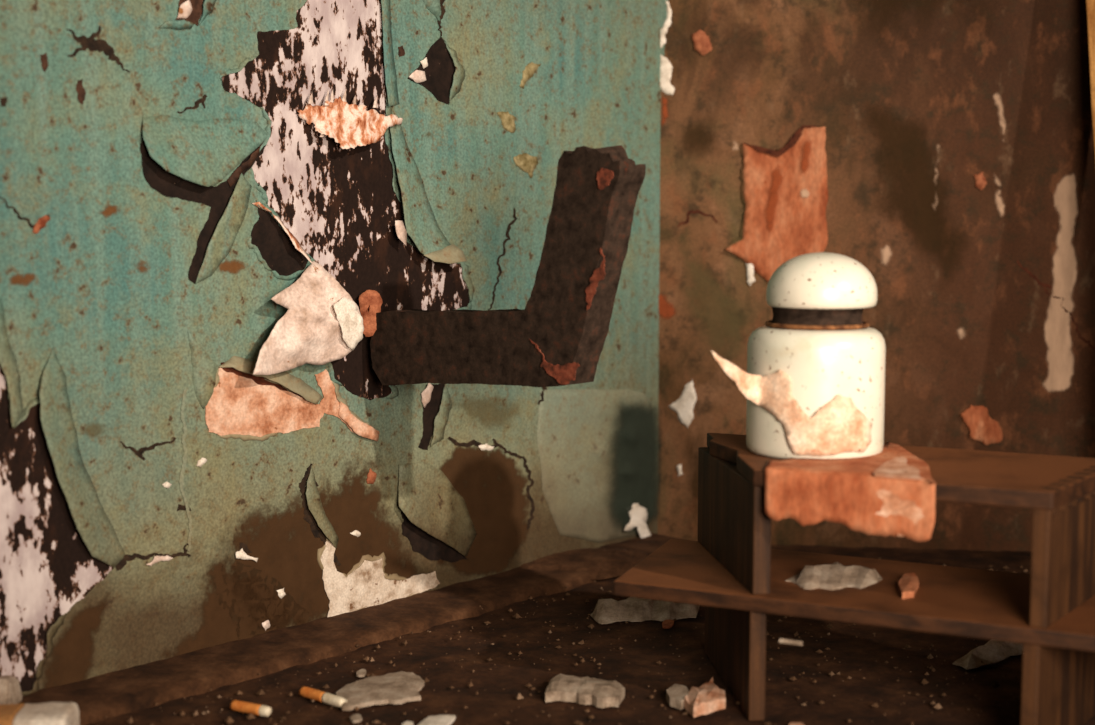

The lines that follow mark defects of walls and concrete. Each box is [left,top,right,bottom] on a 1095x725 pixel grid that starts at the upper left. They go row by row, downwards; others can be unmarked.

crack [66,26,130,73]
corrosion [802,141,811,172]
peeling [33,215,50,234]
peeling [140,0,474,441]
corrosion [766,166,783,230]
crack [488,208,517,310]
corrosion [659,295,675,318]
crack [120,437,176,460]
peeling [0,298,125,696]
peeling [305,383,477,617]
crack [448,436,535,529]